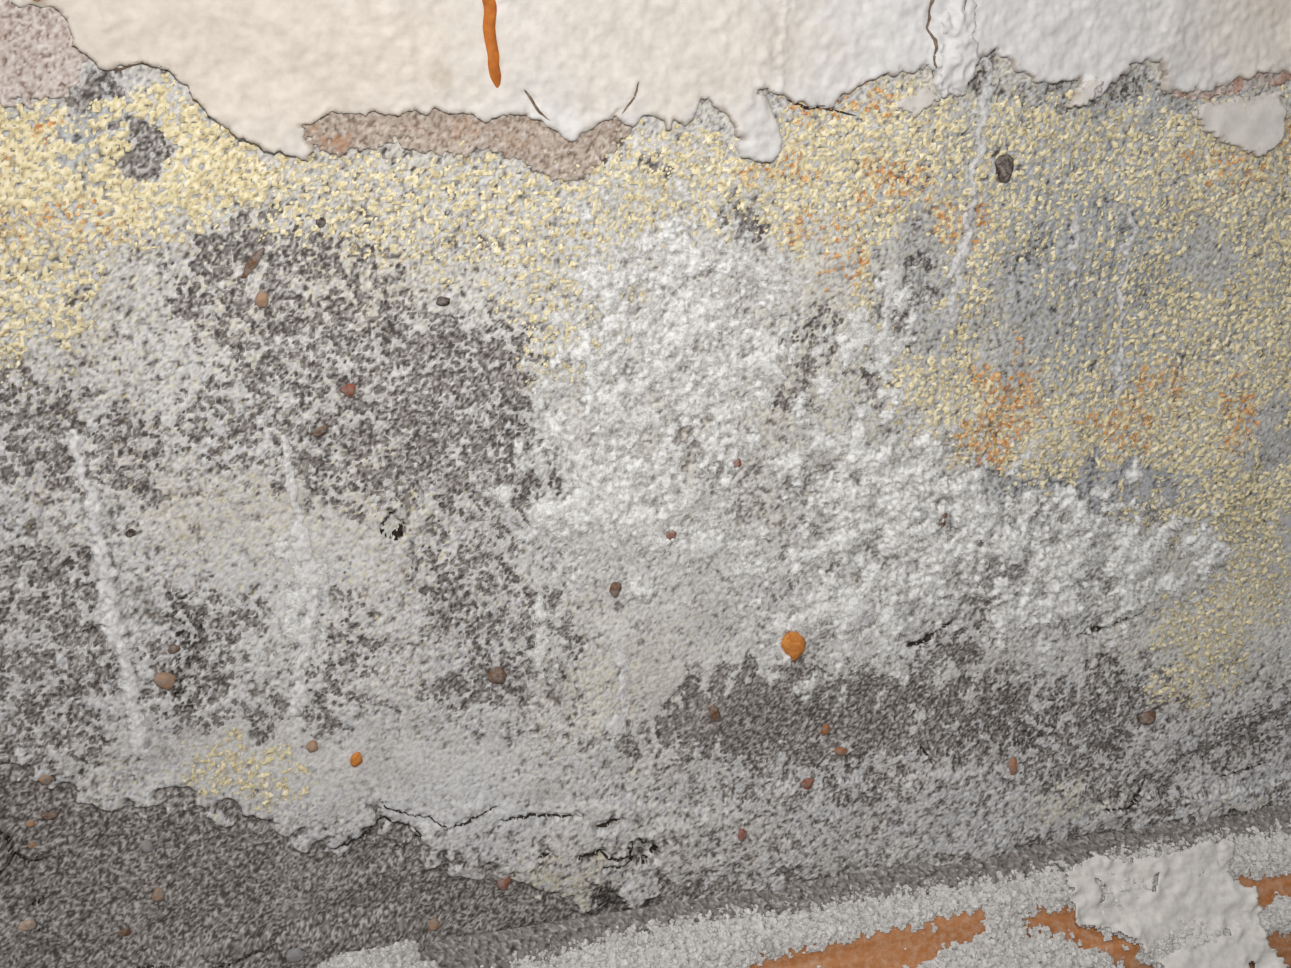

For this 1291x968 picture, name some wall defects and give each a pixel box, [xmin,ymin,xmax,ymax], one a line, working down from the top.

rust [482,0,501,88]
crack [926,0,967,74]
spalling [718,187,771,245]
spalling [873,252,938,353]
spalling [1018,236,1048,269]
spalling [0,201,586,712]
damp [0,55,1291,759]
spalling [769,302,897,417]
spalling [0,535,1291,968]